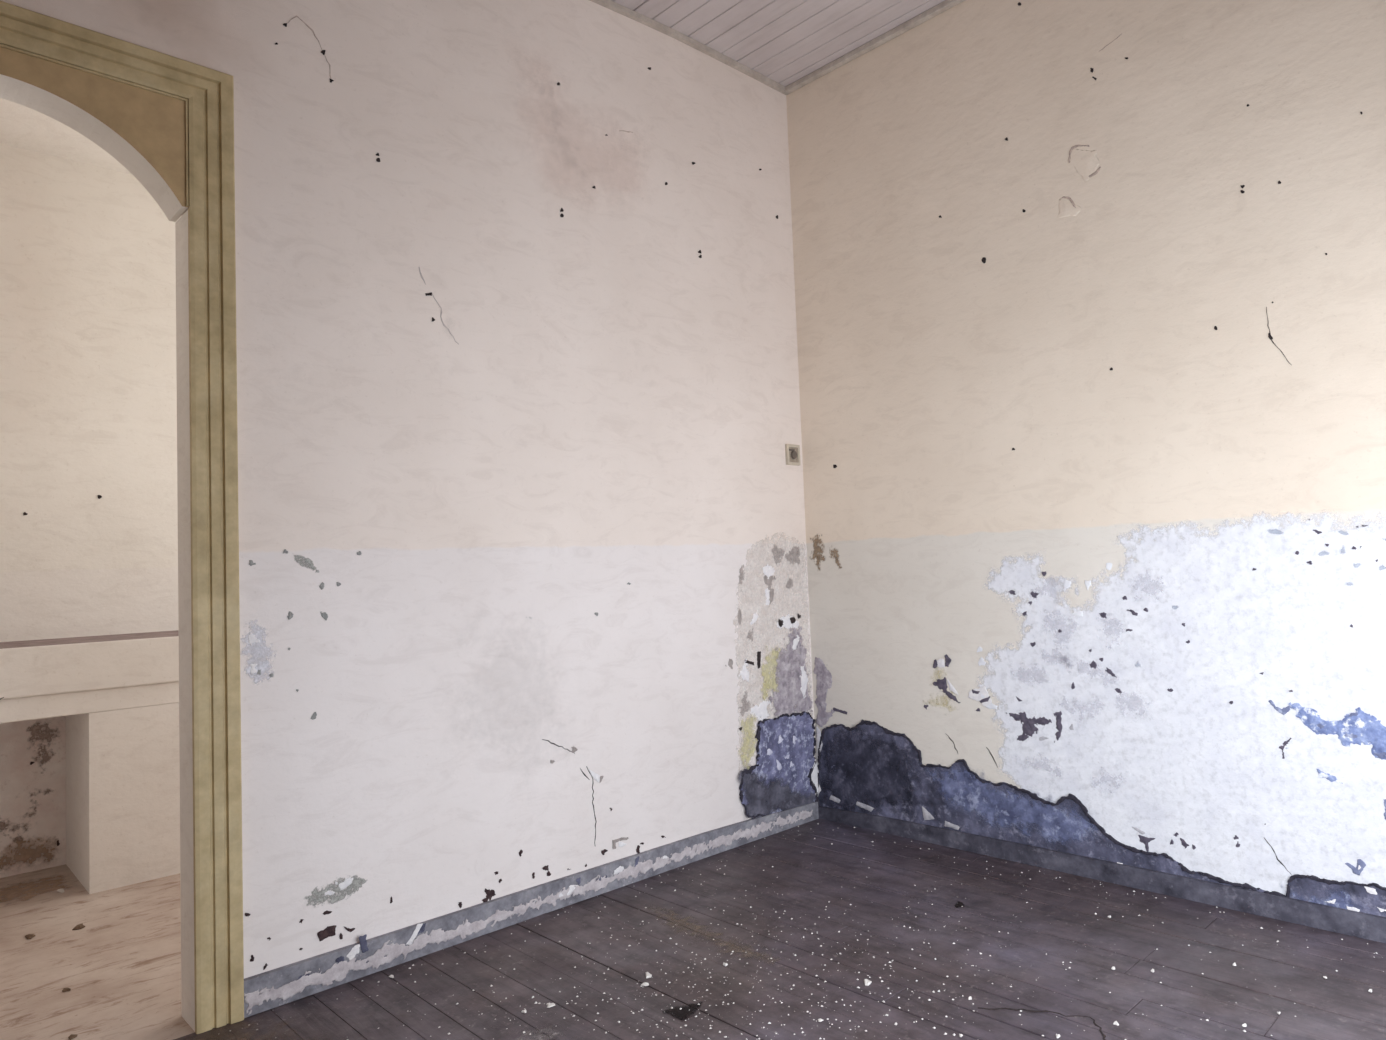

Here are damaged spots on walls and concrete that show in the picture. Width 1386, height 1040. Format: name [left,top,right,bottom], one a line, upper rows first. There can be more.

crack [283,15,334,83]
crack [419,267,458,344]
crack [1266,302,1288,361]
damp [27,722,57,766]
peeling [242,513,1386,1015]
damp [0,789,56,869]